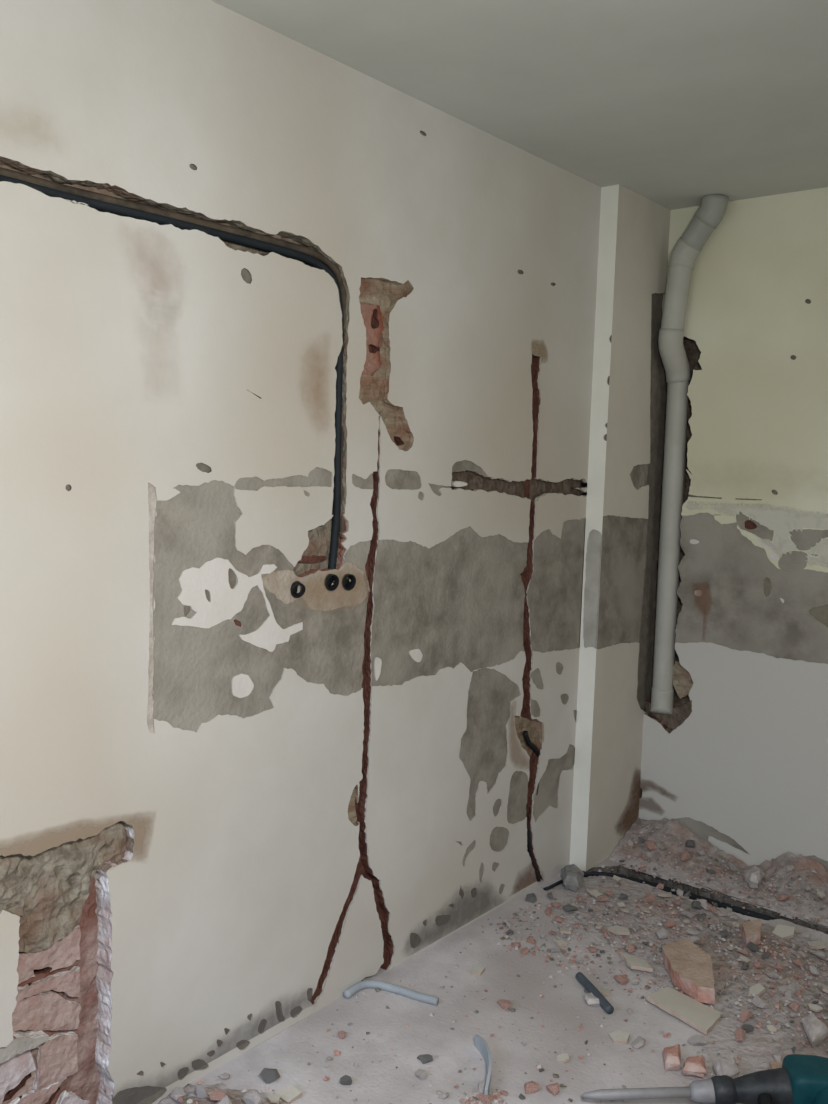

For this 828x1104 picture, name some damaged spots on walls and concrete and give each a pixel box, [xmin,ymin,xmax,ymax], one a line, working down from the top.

spalling [359,277,414,451]
peeling [675,511,828,664]
peeling [147,460,648,948]
spalling [0,821,167,1104]
peeling [178,988,313,1080]